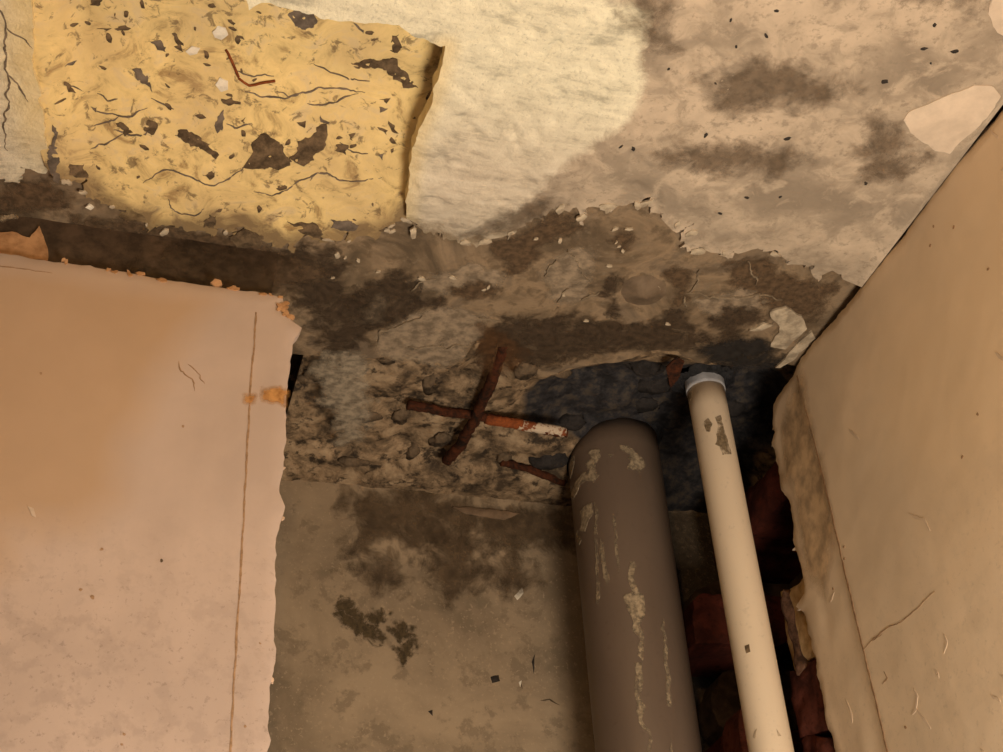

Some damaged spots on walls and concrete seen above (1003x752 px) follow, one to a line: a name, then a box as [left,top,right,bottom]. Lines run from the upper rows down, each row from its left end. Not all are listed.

crack [0,10,33,151]
flaking render [32,0,443,253]
water stain [663,146,794,175]
water stain [716,59,832,110]
water stain [860,121,907,179]
flaking render [210,279,240,291]
flaking render [259,293,295,320]
spalling [281,306,815,513]
water stain [784,382,831,584]
water stain [334,490,576,605]
crack [796,375,935,752]
water stain [333,596,419,667]